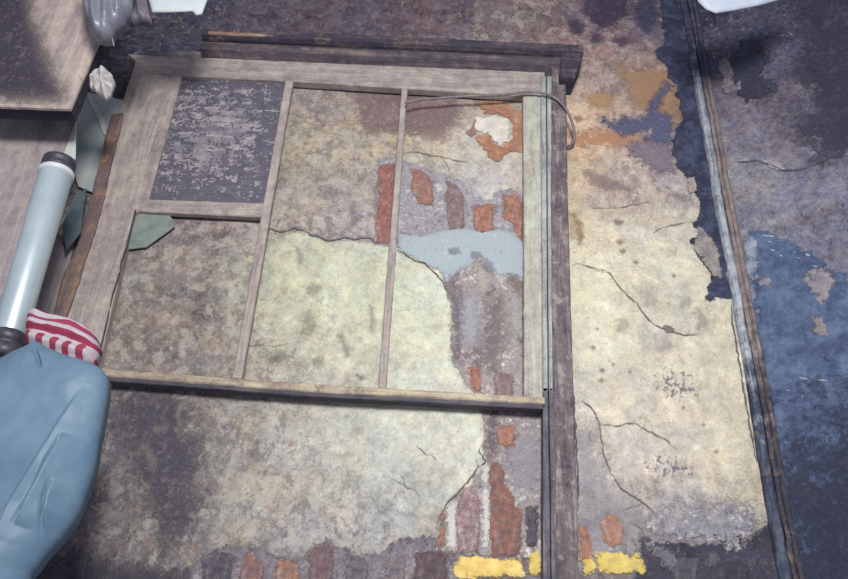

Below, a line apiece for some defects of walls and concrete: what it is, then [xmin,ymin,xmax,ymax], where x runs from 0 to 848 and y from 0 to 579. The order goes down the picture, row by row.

peeling [466,100,522,161]
crack [736,115,837,171]
crack [269,226,378,243]
flaking render [371,156,523,248]
flaking render [443,252,523,396]
crack [578,263,699,335]
flaking render [183,410,541,579]
crack [436,444,486,532]
flaking render [577,510,627,561]
crack [574,396,677,539]